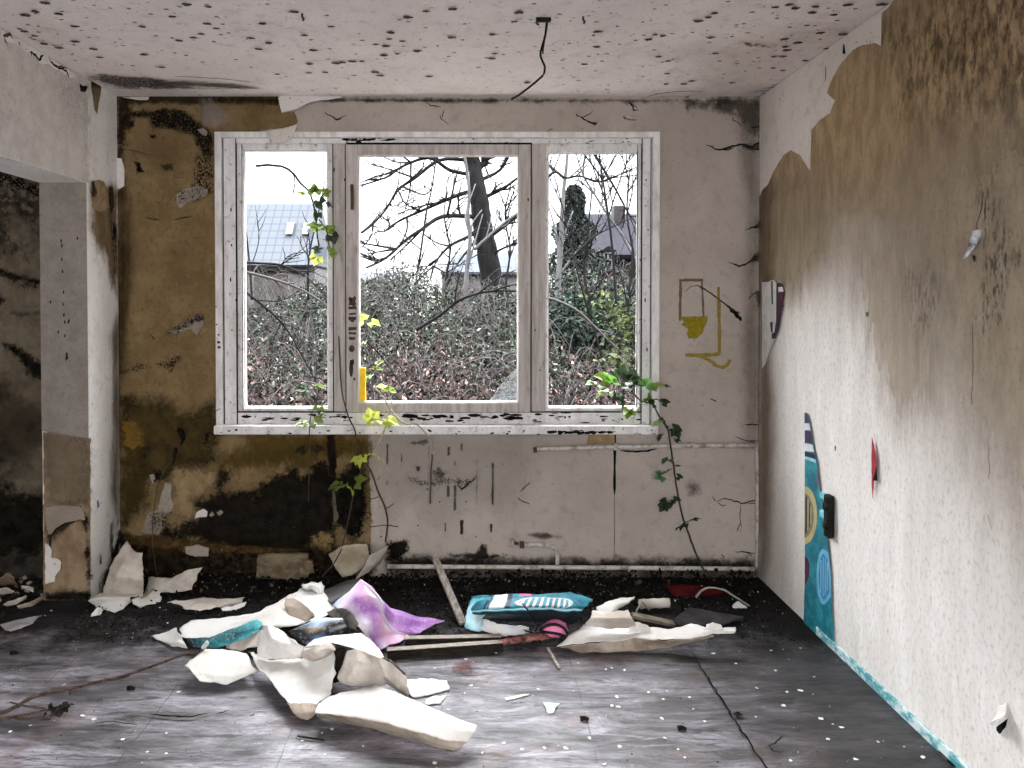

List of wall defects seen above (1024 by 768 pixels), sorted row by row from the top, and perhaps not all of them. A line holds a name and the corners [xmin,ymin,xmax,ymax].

water stain [4,0,279,194]
water stain [292,10,498,103]
crack [707,112,760,151]
water stain [0,172,70,556]
flaking render [92,96,404,557]
water stain [90,187,770,592]
peeling [401,413,623,444]
crack [729,221,761,267]
water stain [759,0,1024,481]
peeling [963,229,982,261]
flaking render [43,432,93,601]
crack [713,498,755,558]